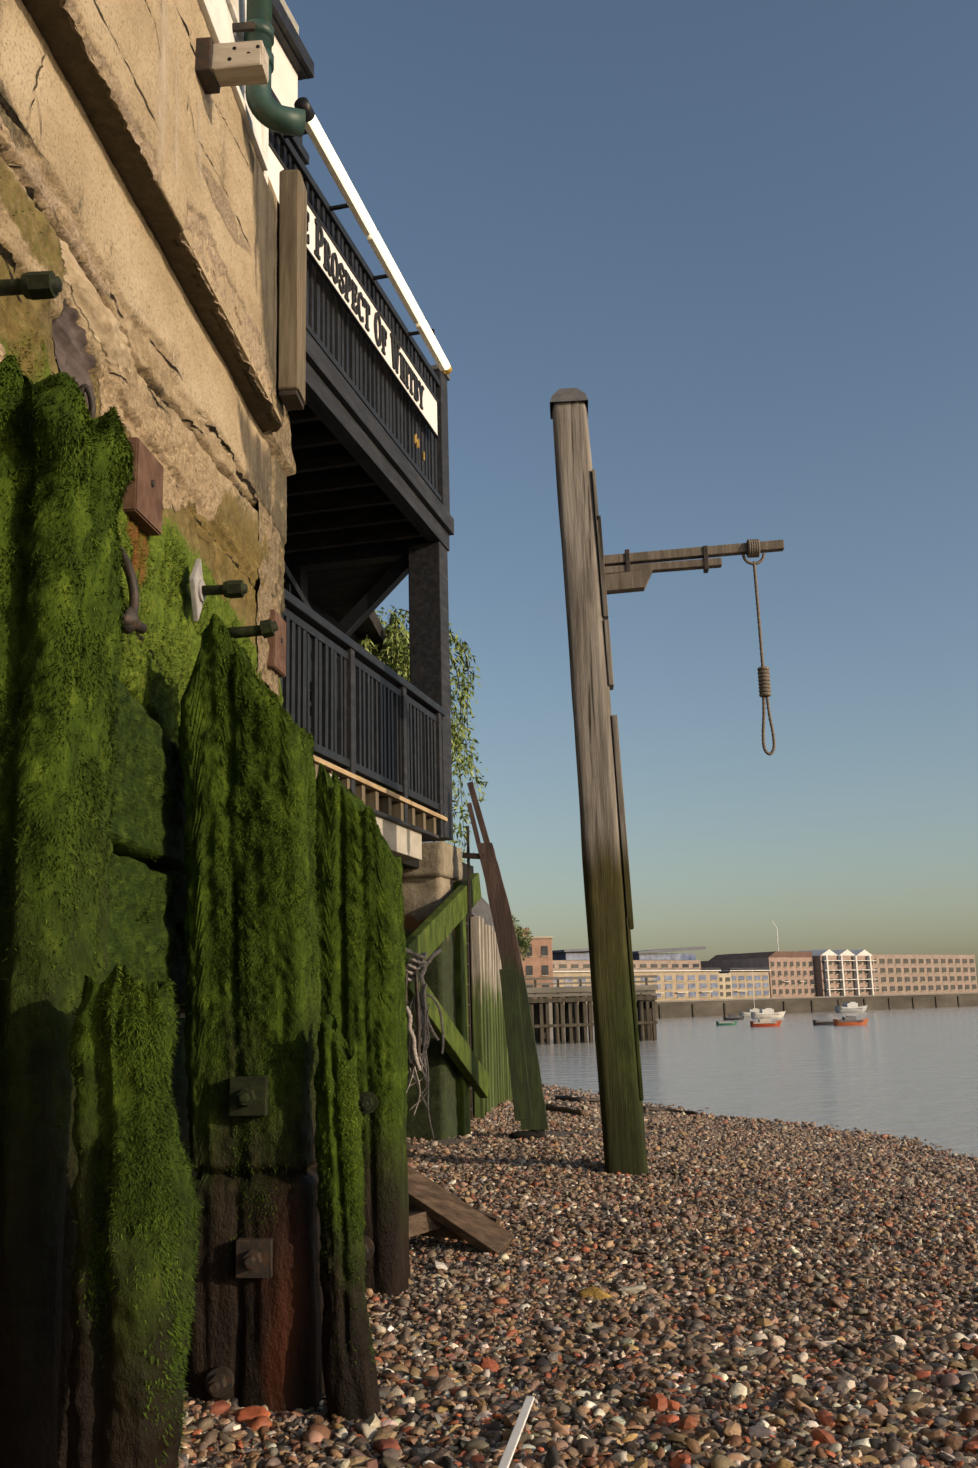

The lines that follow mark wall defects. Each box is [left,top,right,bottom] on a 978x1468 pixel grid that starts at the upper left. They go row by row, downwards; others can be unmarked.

crack [0,47,49,219]